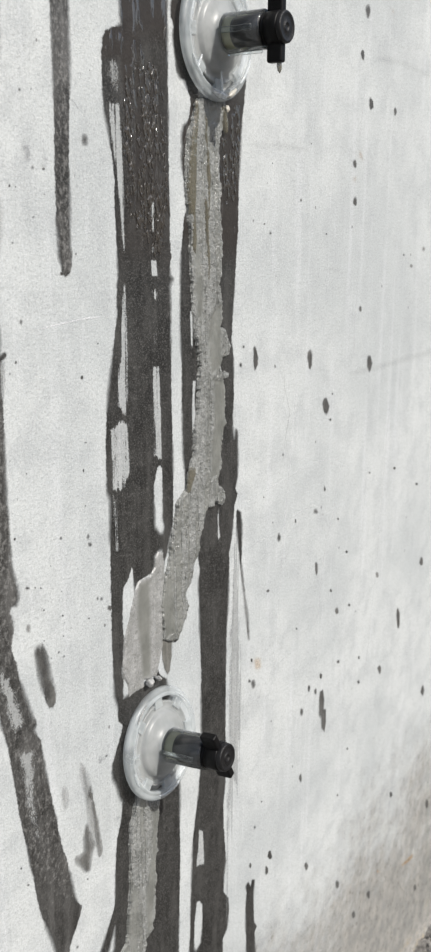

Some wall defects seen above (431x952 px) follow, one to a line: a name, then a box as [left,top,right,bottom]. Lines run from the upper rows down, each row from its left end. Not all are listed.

leakage [49,0,72,276]
leakage [0,361,100,952]
leakage [101,0,255,952]
leakage [245,863,257,952]